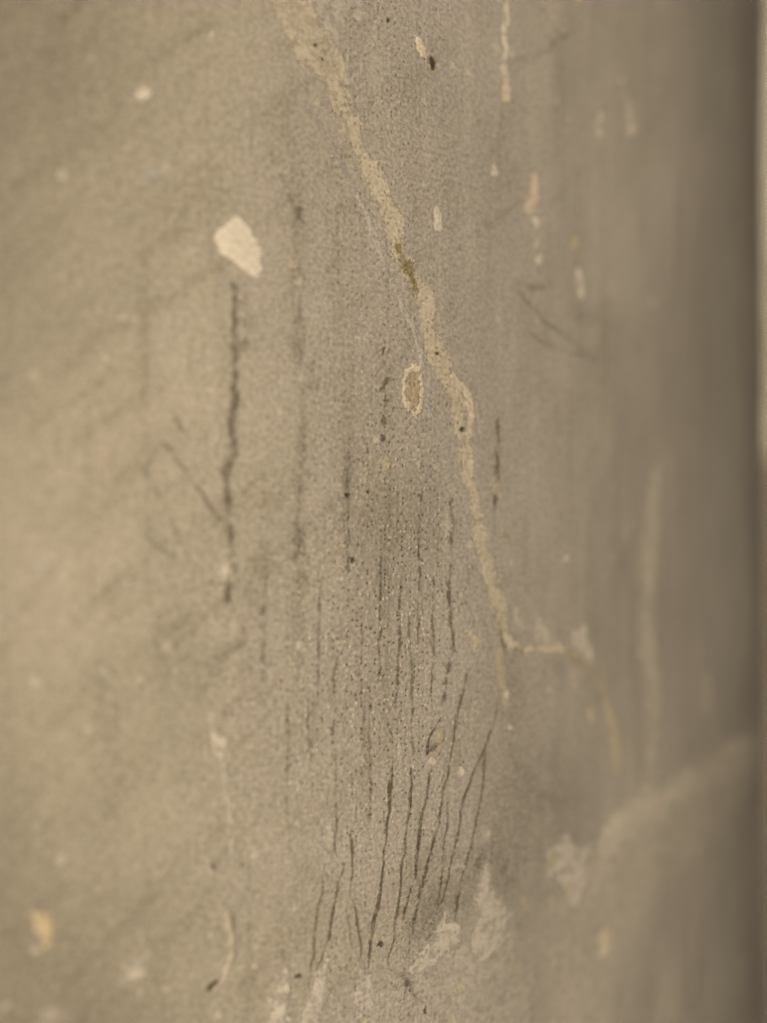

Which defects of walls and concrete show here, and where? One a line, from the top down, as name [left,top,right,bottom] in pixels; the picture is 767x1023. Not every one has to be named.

peeling [213,215,264,279]
spalling [380,275,433,420]
crack [269,0,623,777]